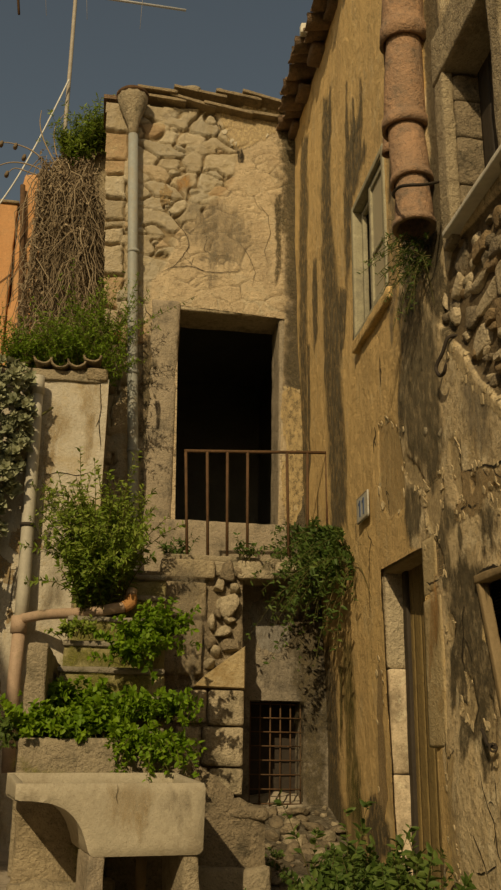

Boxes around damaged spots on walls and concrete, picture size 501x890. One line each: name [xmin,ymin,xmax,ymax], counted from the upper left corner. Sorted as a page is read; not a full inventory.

flaking render [216,105,283,163]
crack [162,204,273,285]
water stain [275,79,365,539]
water stain [387,174,455,494]
flaking render [446,344,501,418]
crack [460,443,501,479]
water stain [405,486,421,538]
water stain [434,499,498,781]
crack [473,775,501,890]